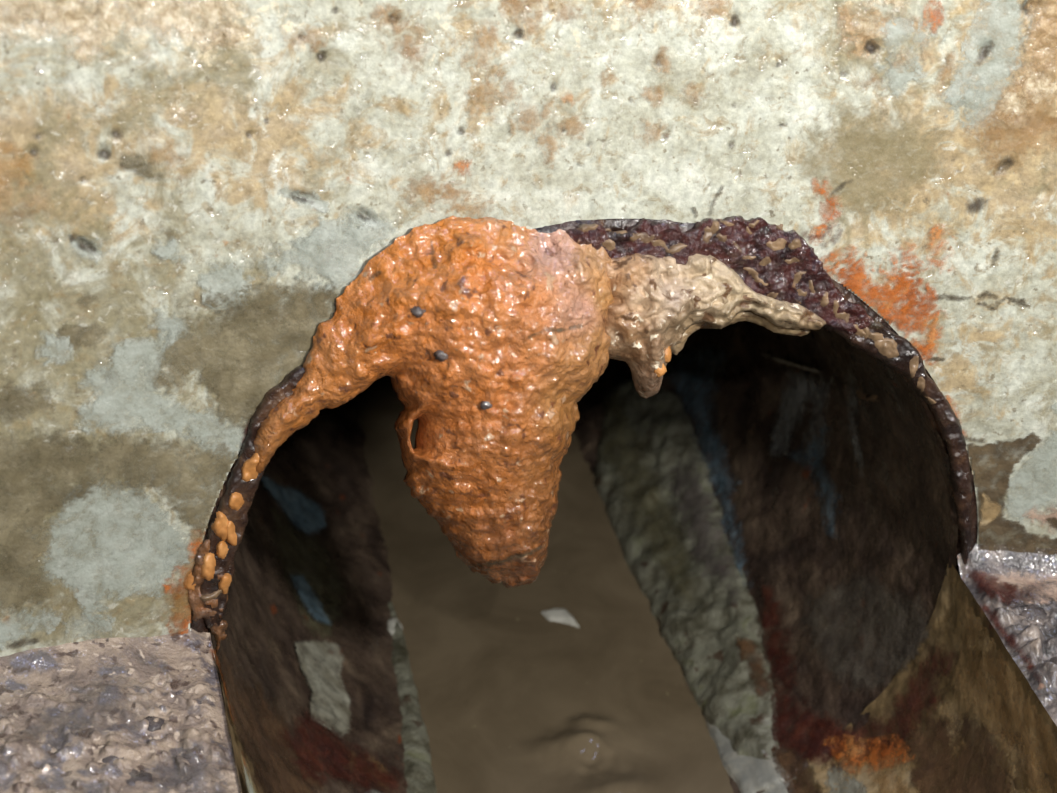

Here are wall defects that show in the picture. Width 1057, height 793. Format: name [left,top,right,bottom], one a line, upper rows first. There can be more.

rust [811,181,841,240]
leakage [153,278,339,427]
rust [243,184,614,588]
rust [821,245,943,364]
crack [931,291,1026,310]
leakage [0,386,238,626]
rust [758,587,957,773]